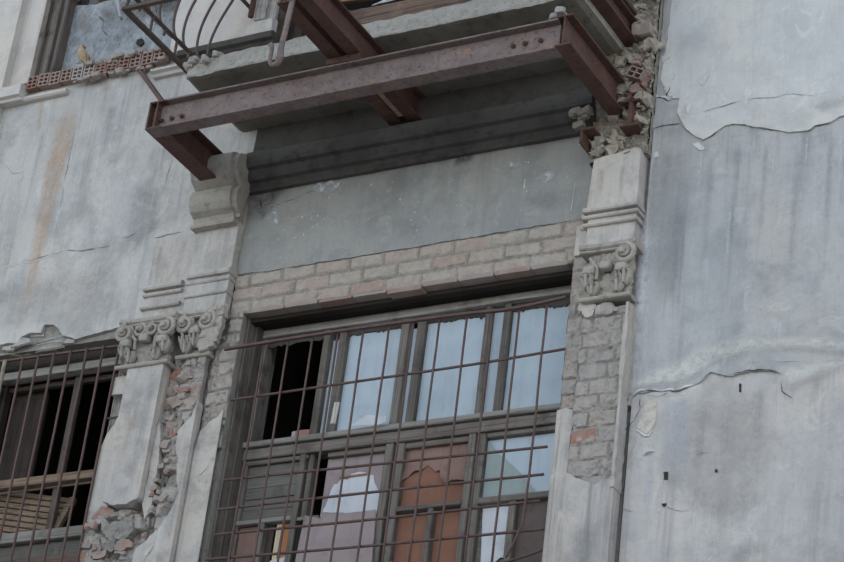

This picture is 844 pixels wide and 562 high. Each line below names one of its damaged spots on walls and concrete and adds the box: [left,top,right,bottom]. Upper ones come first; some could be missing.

spalling [73,38,169,84]
spalling [568,0,676,169]
crack [656,89,678,101]
crack [1,130,135,268]
spalling [79,303,247,562]
peeling [636,400,657,438]
crack [625,361,798,430]